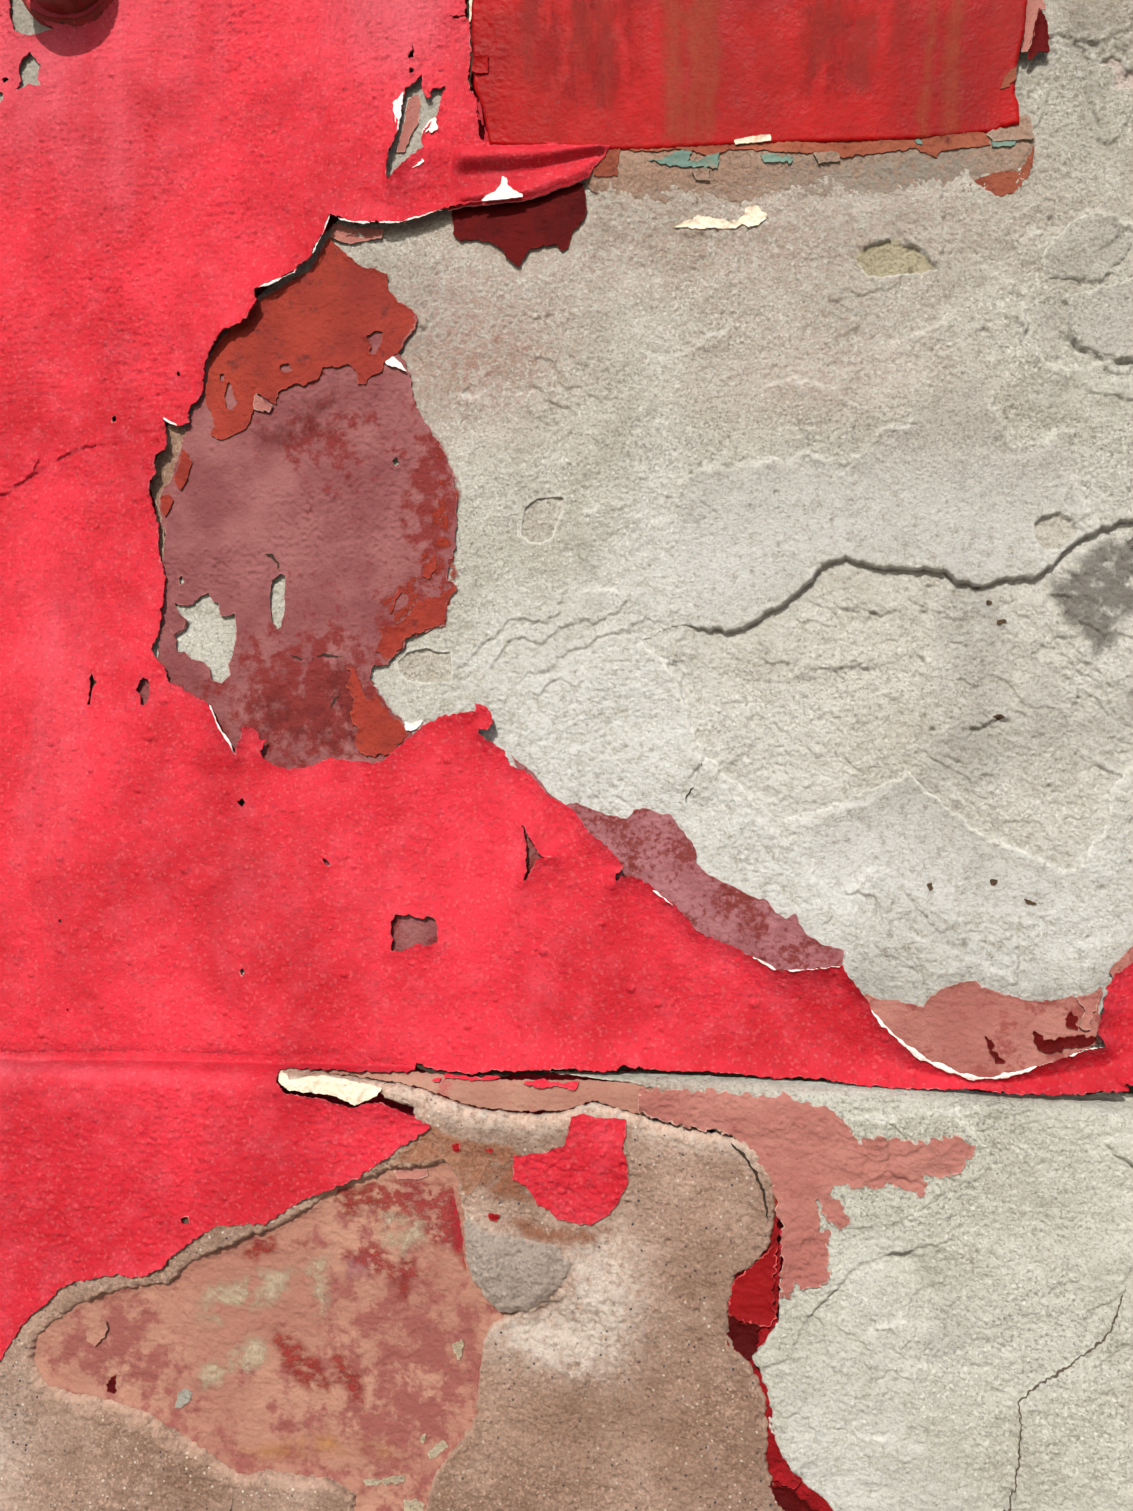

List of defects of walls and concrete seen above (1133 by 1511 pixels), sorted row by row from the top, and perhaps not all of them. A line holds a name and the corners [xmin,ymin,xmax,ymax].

peeling [10,0,52,35]
peeling [0,53,41,102]
spalling [150,0,1133,1077]
peeling [137,678,150,705]
crack [416,1064,844,1083]
crack [968,1088,1034,1096]
crack [1073,1084,1133,1095]
spalling [277,1068,1133,1511]
spalling [0,1190,405,1511]
crack [1003,1290,1126,1511]